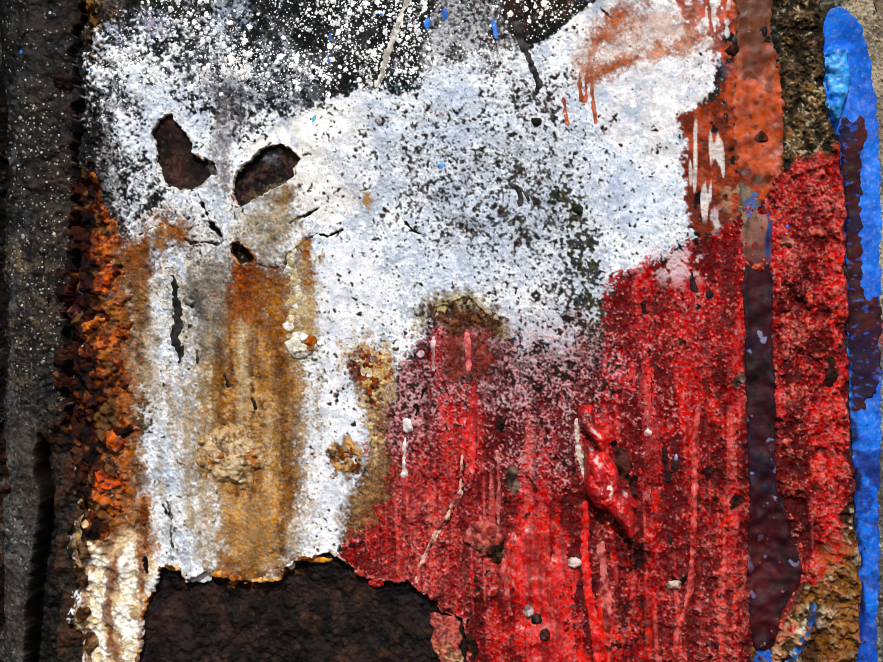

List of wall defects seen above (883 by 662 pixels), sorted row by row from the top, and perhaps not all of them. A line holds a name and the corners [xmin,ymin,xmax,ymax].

peeling [150,109,218,194]
peeling [230,143,302,207]
rust [47,170,329,589]
rust [75,602,91,623]
rust [84,632,99,651]
peeling [135,549,479,662]